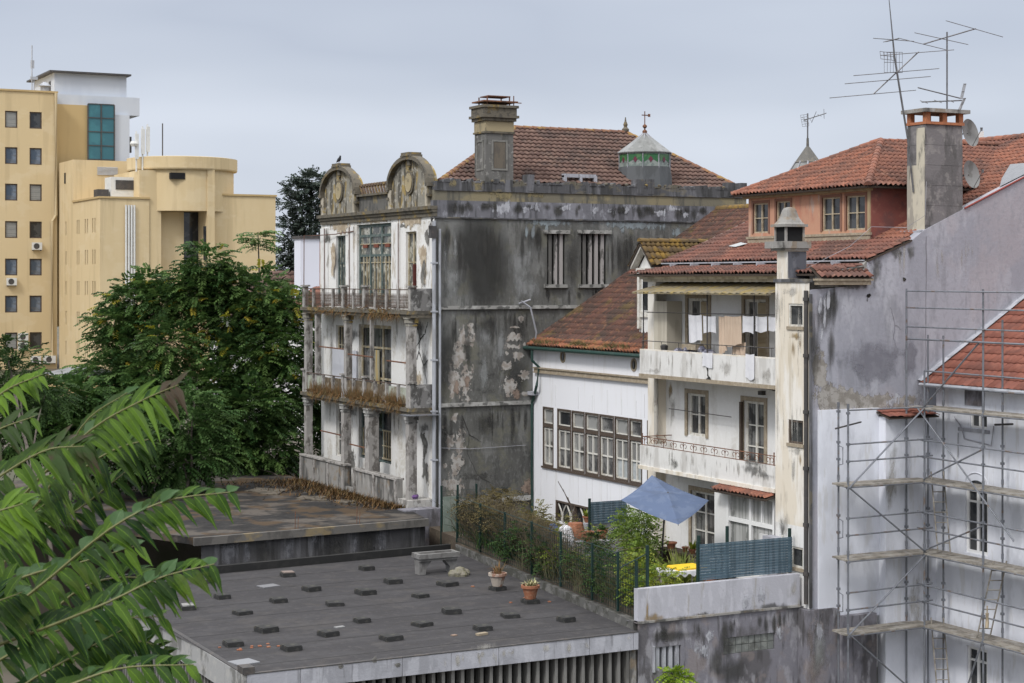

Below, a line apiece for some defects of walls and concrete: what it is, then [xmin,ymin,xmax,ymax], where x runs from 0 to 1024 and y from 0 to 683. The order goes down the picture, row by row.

flaking render [444,323,476,403]
flaking render [499,316,530,399]
flaking render [420,413,466,495]
damp [442,419,463,449]
damp [479,412,527,436]
damp [656,630,683,641]
damp [694,612,740,679]
damp [759,603,785,640]